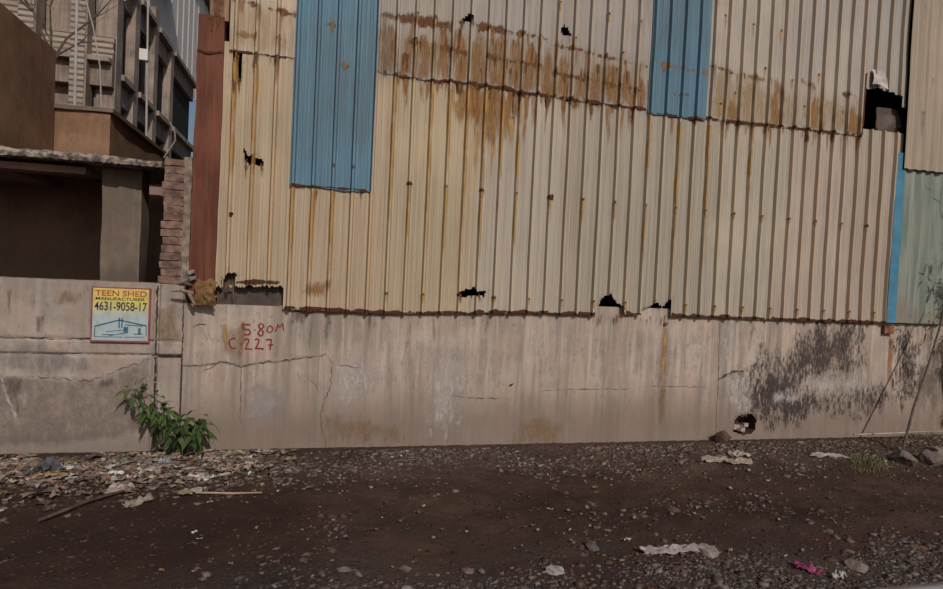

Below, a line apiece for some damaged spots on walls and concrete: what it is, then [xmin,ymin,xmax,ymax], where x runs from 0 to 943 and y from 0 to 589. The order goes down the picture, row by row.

rust [380,11,878,243]
rust [221,279,280,294]
crack [179,353,357,442]
spalling [732,413,758,437]
damp [727,320,943,431]